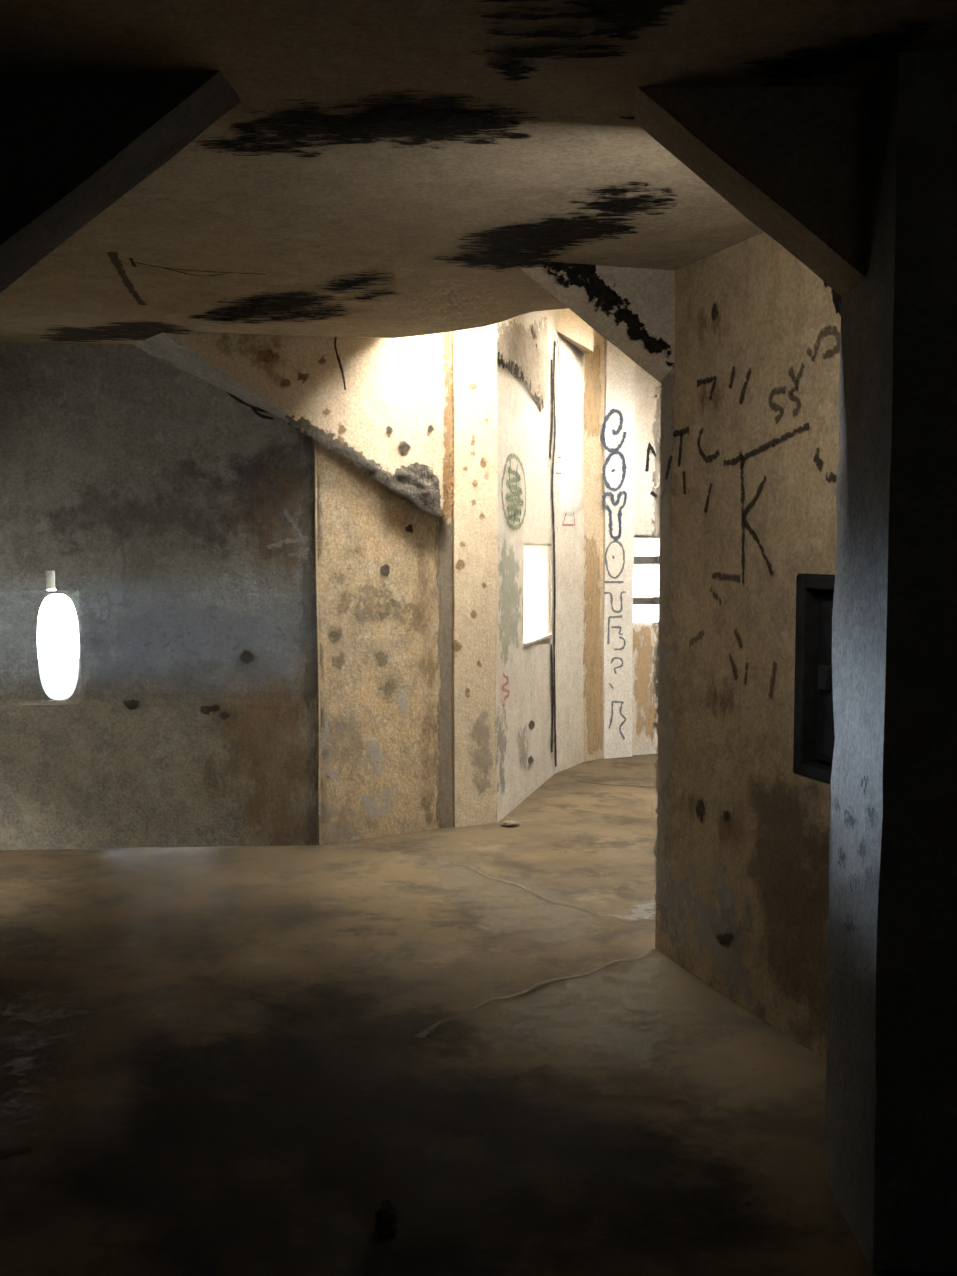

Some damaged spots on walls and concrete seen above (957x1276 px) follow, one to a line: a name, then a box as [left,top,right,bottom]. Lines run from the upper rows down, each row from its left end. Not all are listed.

spalling [285,415,444,518]